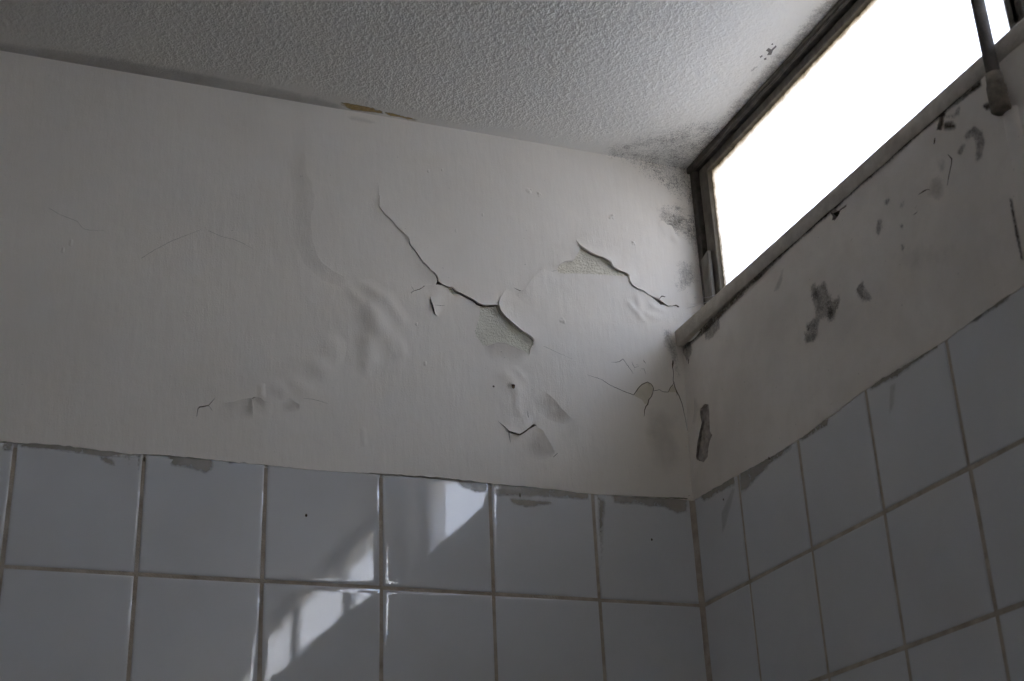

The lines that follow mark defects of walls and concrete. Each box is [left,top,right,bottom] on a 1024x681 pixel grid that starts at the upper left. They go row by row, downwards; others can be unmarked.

peeling [378,172,679,366]
peeling [498,390,573,460]
crack [589,359,689,431]
spalling [698,404,712,461]